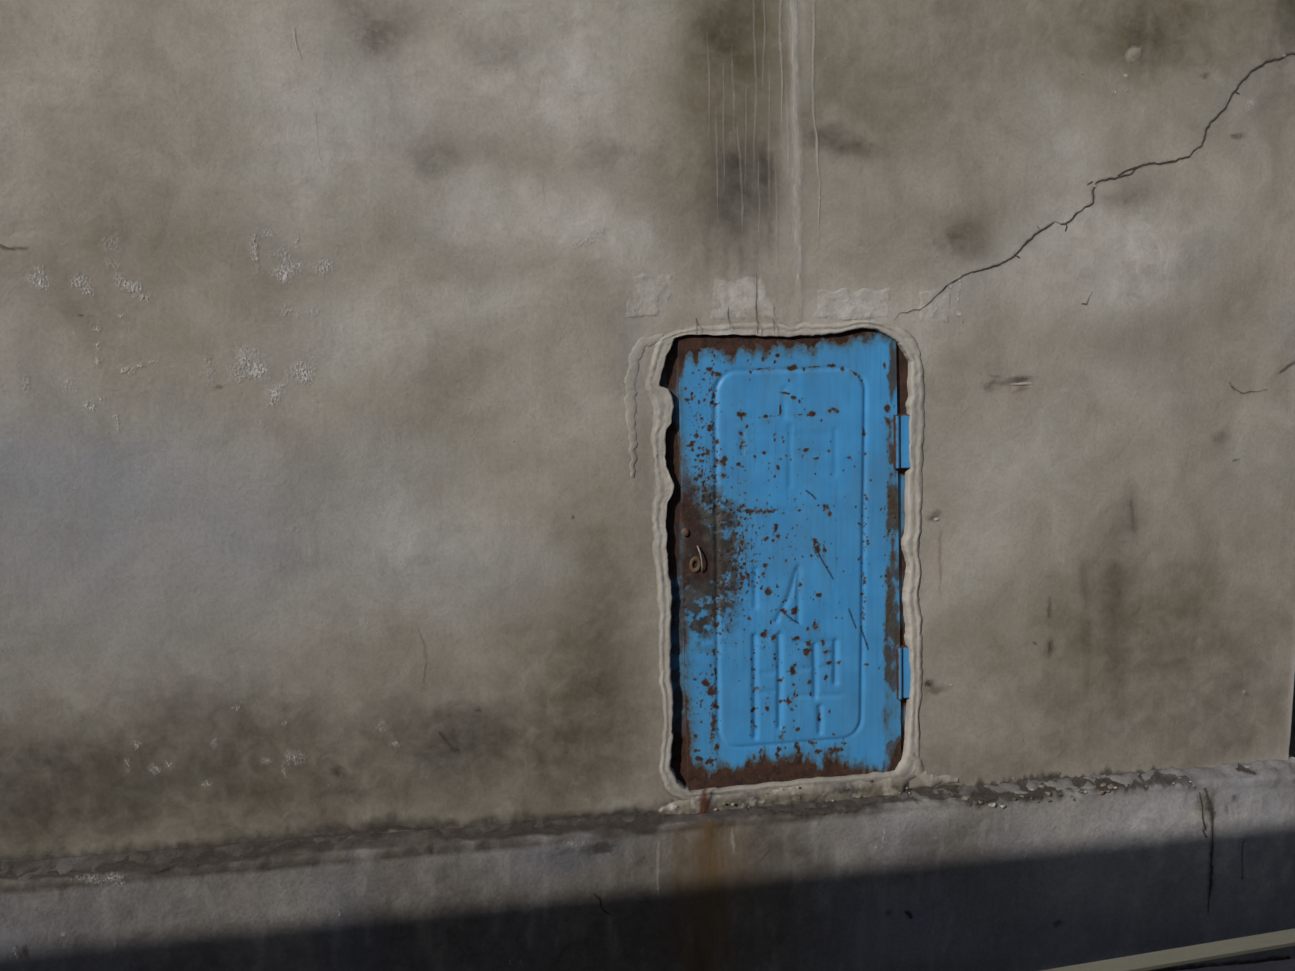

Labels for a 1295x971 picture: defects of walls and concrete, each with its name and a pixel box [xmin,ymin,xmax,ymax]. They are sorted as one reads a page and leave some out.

water stain [782,0,819,322]
crack [895,53,1295,319]
spalling [955,765,1195,808]
crack [1199,788,1214,912]